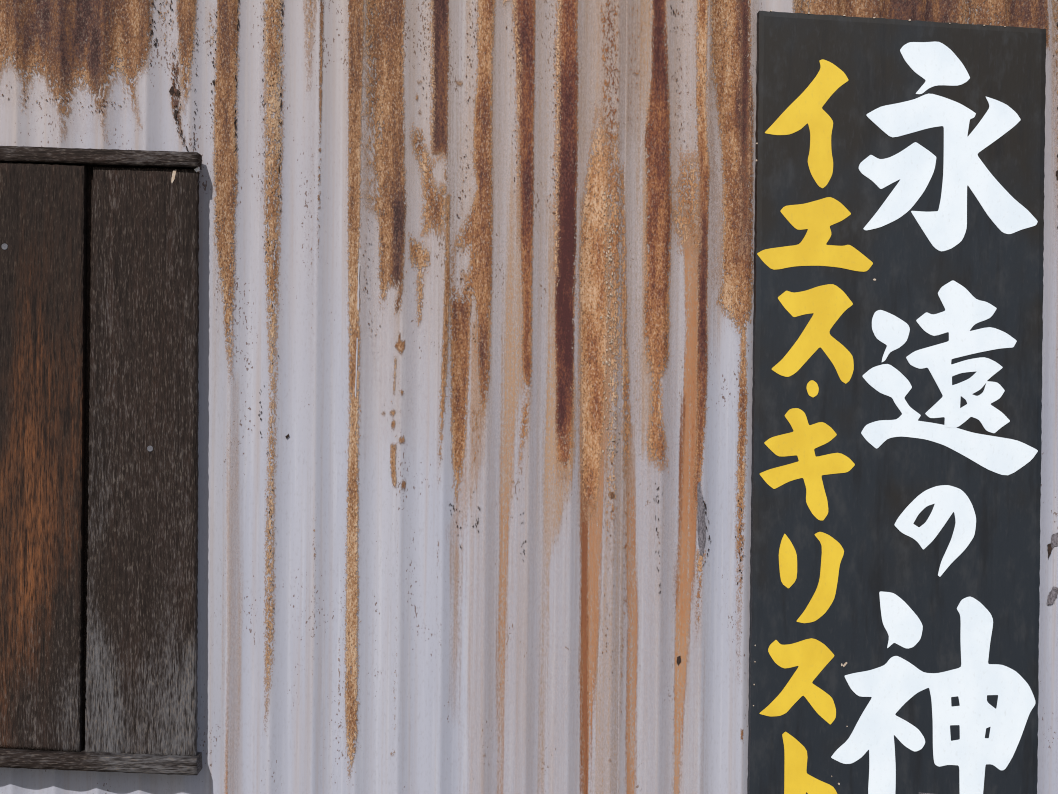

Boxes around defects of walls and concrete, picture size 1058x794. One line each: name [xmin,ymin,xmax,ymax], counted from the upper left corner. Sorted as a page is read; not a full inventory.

corrosion [0,0,157,128]
corrosion [173,0,242,377]
corrosion [258,0,286,719]
corrosion [305,0,324,264]
corrosion [338,0,538,776]
corrosion [545,0,755,794]
corrosion [790,0,1050,50]